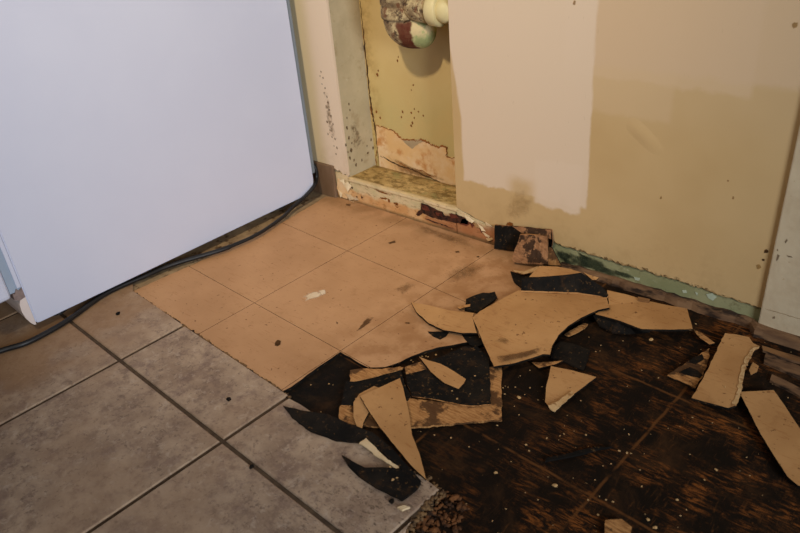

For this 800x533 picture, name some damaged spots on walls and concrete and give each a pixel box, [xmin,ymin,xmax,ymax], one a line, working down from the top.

spalling [376,125,456,185]
peeling [337,178,363,202]
spalling [416,203,492,241]
damp [557,252,631,278]
spalling [359,438,399,468]
spalling [397,470,446,533]